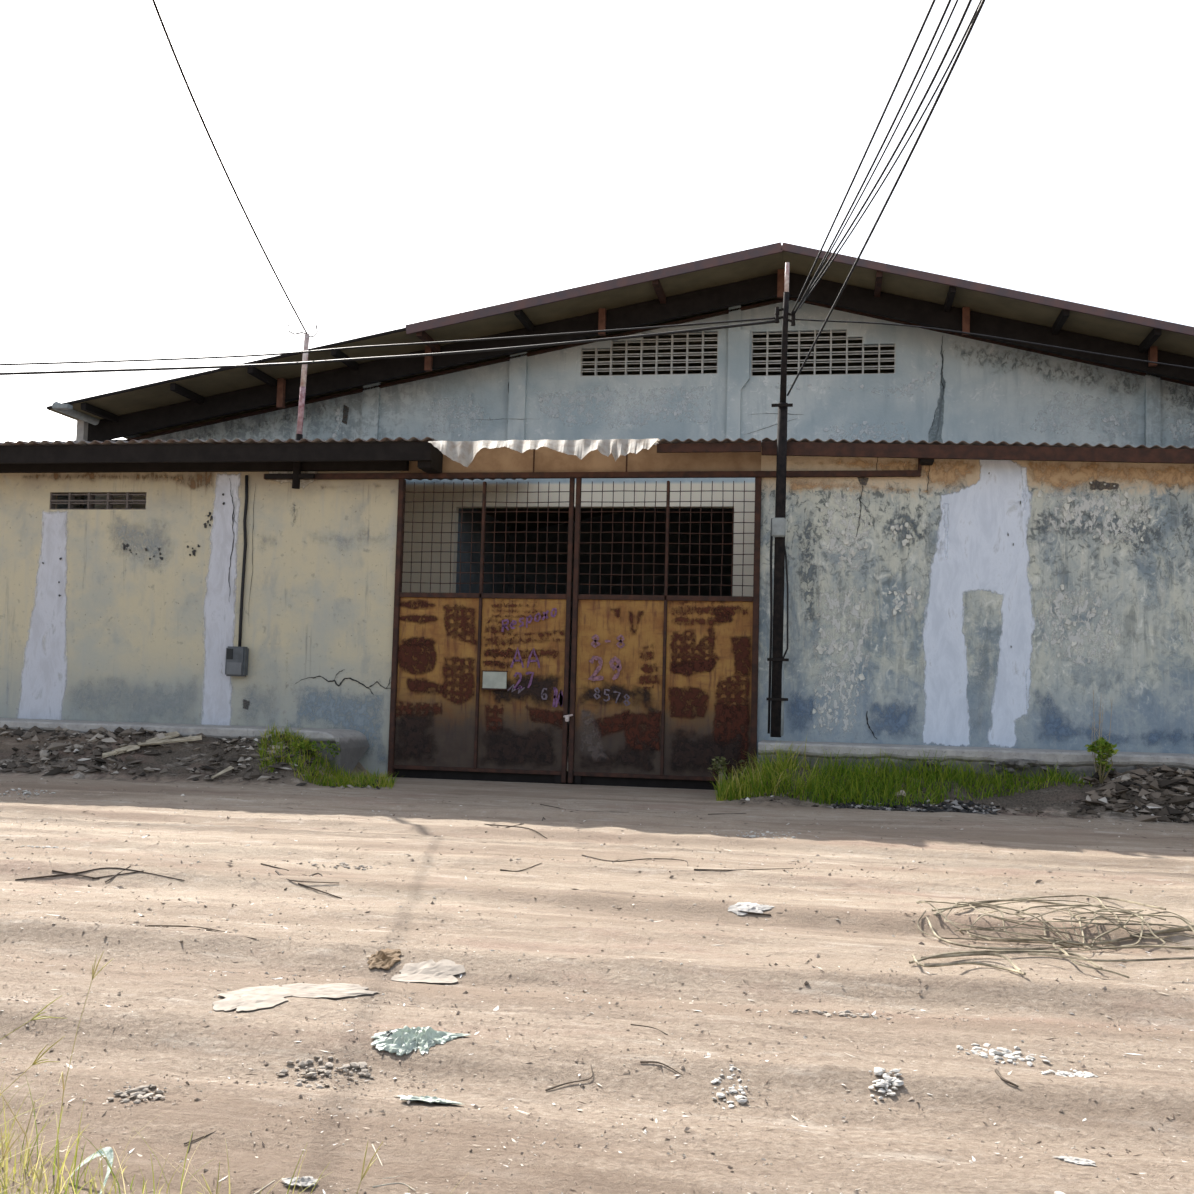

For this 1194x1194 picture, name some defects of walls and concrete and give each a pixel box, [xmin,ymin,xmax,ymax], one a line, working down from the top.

crack [927,336,946,491]
crack [295,670,391,694]
corrosion [396,600,564,766]
corrosion [582,601,751,775]